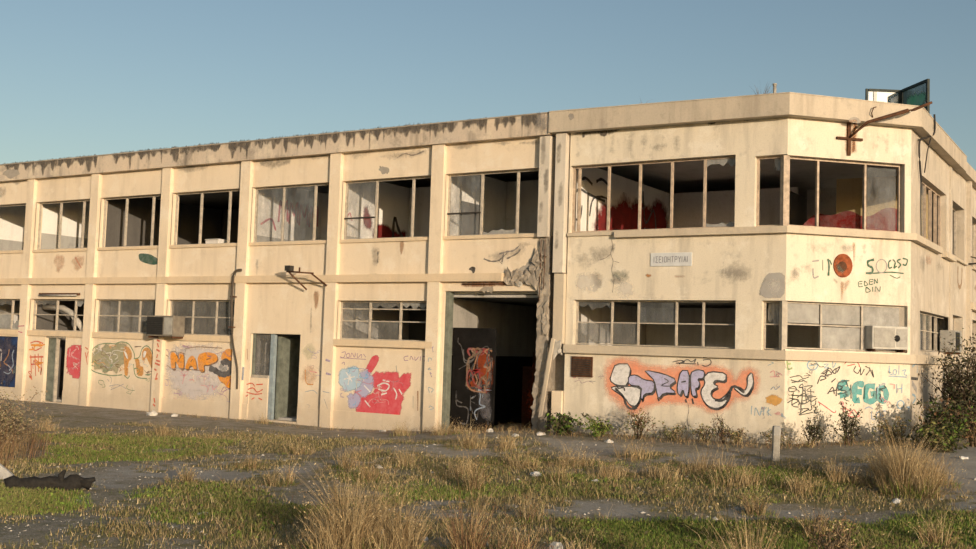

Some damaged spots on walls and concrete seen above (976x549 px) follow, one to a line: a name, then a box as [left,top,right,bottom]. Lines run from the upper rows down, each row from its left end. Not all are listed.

damp [114,115,540,165]
damp [4,156,97,175]
peeling [760,273,785,298]
spalling [462,236,554,430]